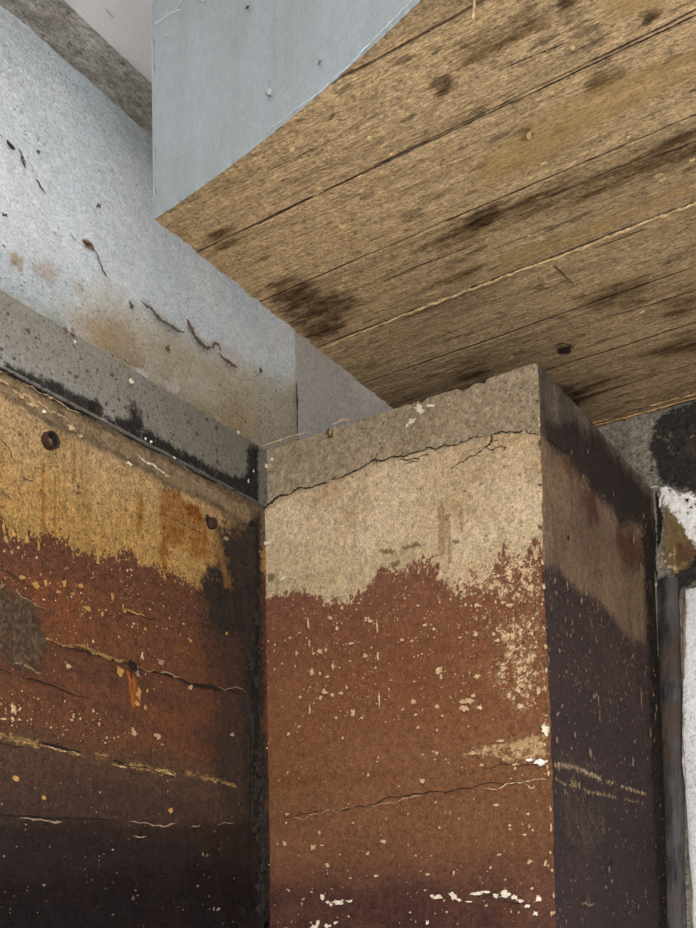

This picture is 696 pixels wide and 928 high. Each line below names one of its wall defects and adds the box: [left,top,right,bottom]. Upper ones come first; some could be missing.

crack [1,135,46,194]
crack [0,368,165,455]
leakage [649,401,696,493]
peeling [2,523,40,559]
spalling [0,562,107,675]
crack [0,669,93,700]
rust [117,667,149,710]
crack [40,429,571,928]
leakage [545,421,696,928]
crack [0,813,125,822]